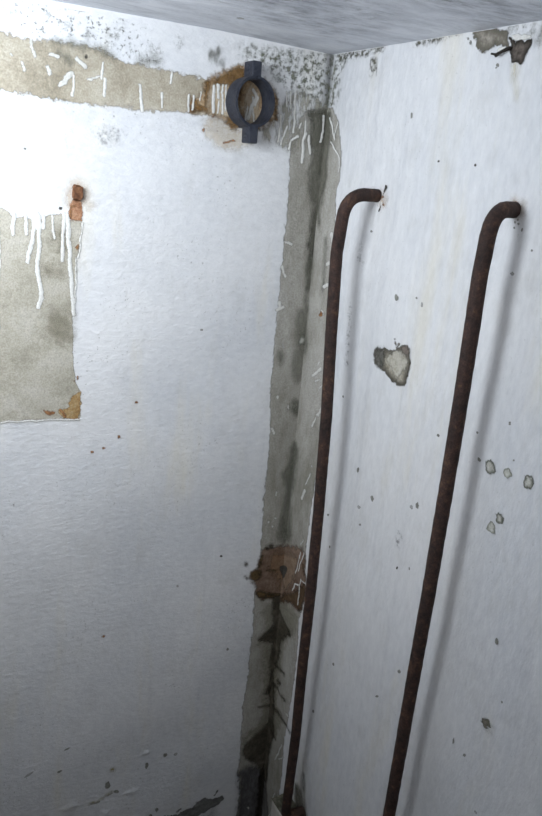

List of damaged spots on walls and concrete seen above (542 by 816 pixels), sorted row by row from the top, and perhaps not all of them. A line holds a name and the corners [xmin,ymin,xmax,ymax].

peeling [0,31,216,116]
corrosion [189,64,278,148]
spalling [467,28,532,65]
corrosion [68,200,83,221]
peeling [0,207,84,424]
peeling [258,91,342,571]
spalling [373,338,411,386]
corrosion [245,540,306,612]
peeling [236,586,304,816]
spalling [170,790,224,816]